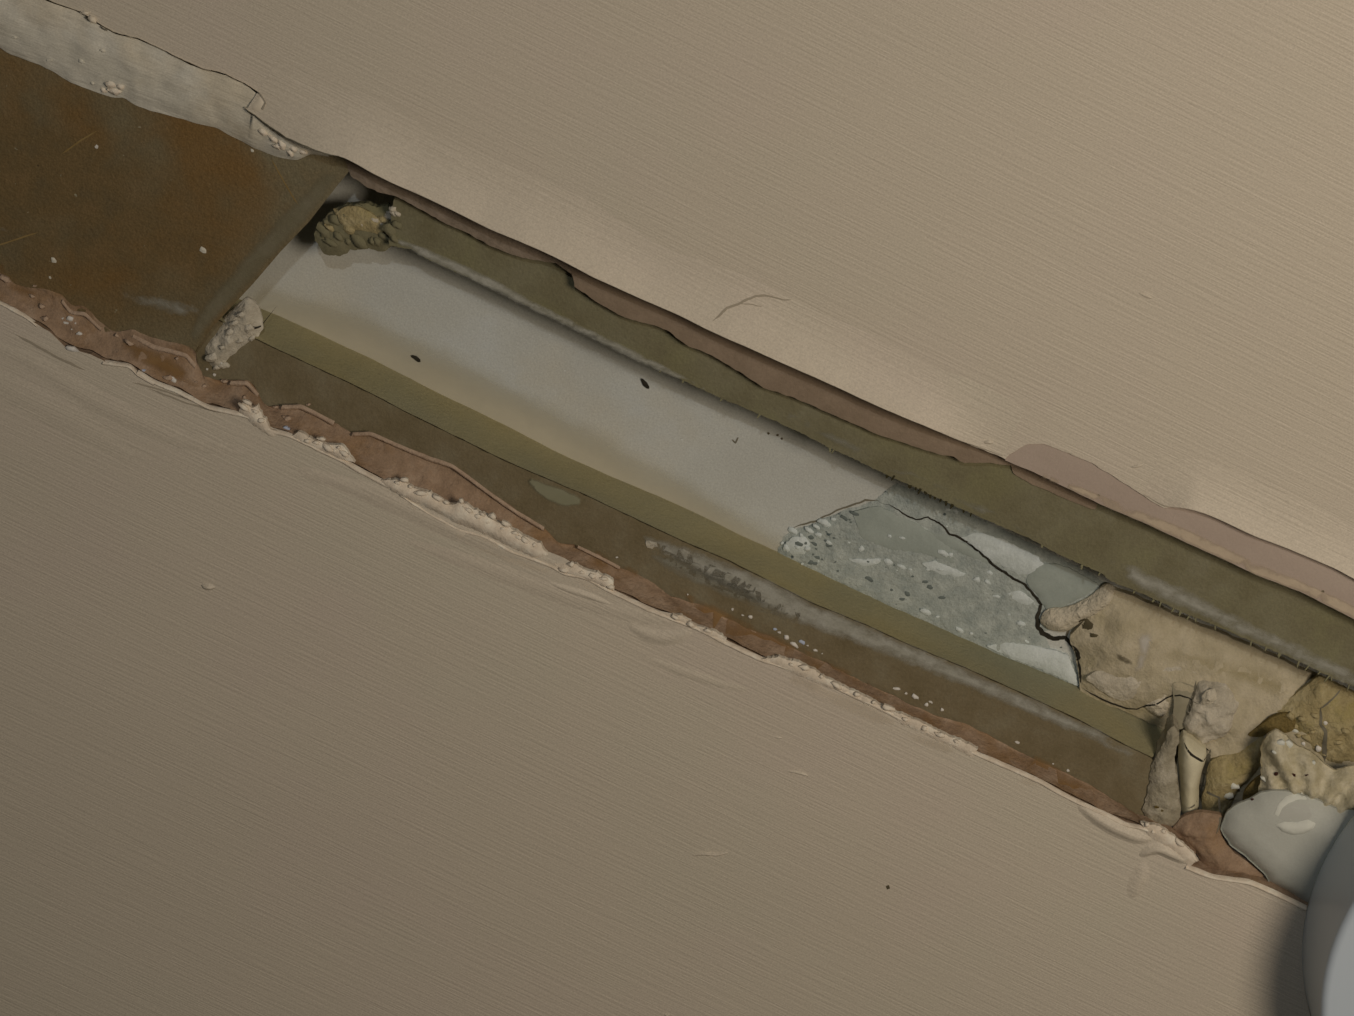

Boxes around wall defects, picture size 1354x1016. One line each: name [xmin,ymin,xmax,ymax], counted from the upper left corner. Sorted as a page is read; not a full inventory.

flaking render [0,273,1354,911]